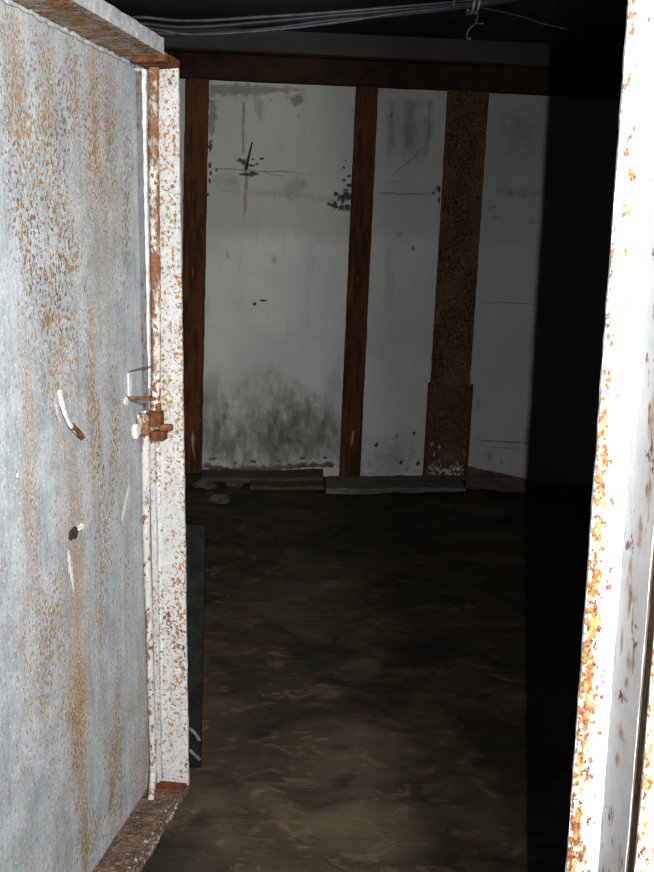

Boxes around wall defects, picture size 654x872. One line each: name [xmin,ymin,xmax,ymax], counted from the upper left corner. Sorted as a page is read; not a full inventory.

corrosion [627,0,637,40]
corrosion [604,204,632,349]
corrosion [161,368,178,497]
corrosion [645,408,654,494]
corrosion [567,365,618,872]